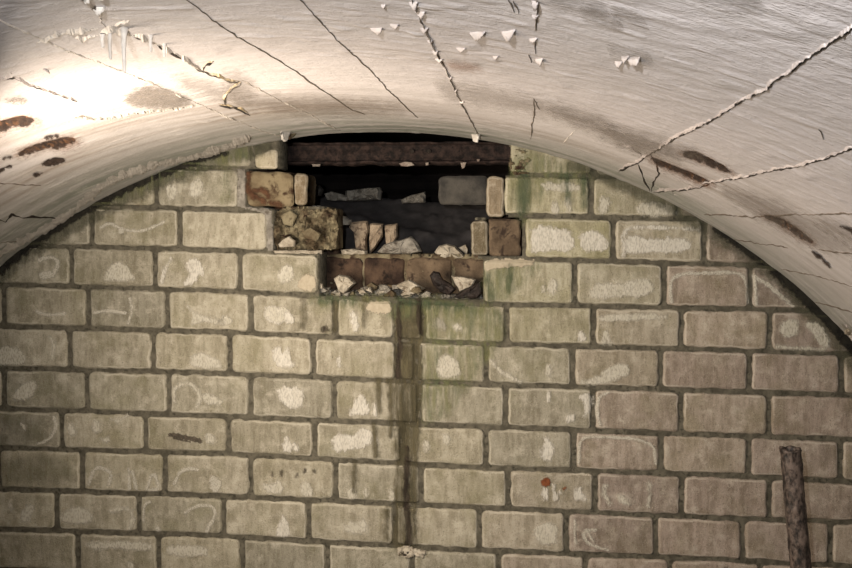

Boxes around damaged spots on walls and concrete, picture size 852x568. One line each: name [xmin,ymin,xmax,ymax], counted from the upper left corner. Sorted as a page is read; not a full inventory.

water stain [124,84,192,110]
crack [0,20,340,137]
crack [186,0,365,115]
spalling [273,206,343,250]
crack [300,0,418,118]
spalling [286,132,490,143]
spalling [287,165,514,202]
peeling [501,29,515,42]
water stain [529,163,852,368]
crack [618,24,852,195]
water stain [331,298,463,558]
water stain [566,363,629,425]